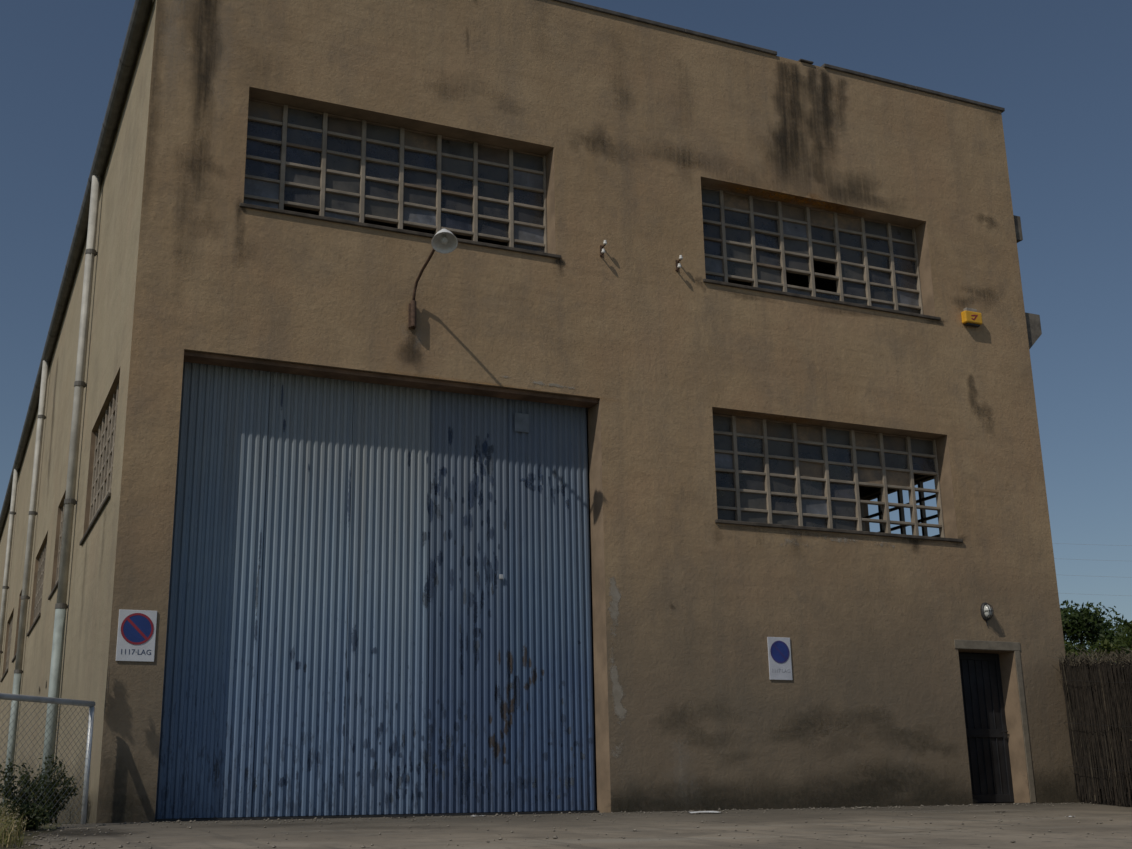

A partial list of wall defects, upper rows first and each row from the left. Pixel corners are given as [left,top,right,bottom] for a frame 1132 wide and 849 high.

peeling [422,434,507,675]
peeling [520,463,569,509]
peeling [245,751,320,796]
peeling [339,625,593,805]